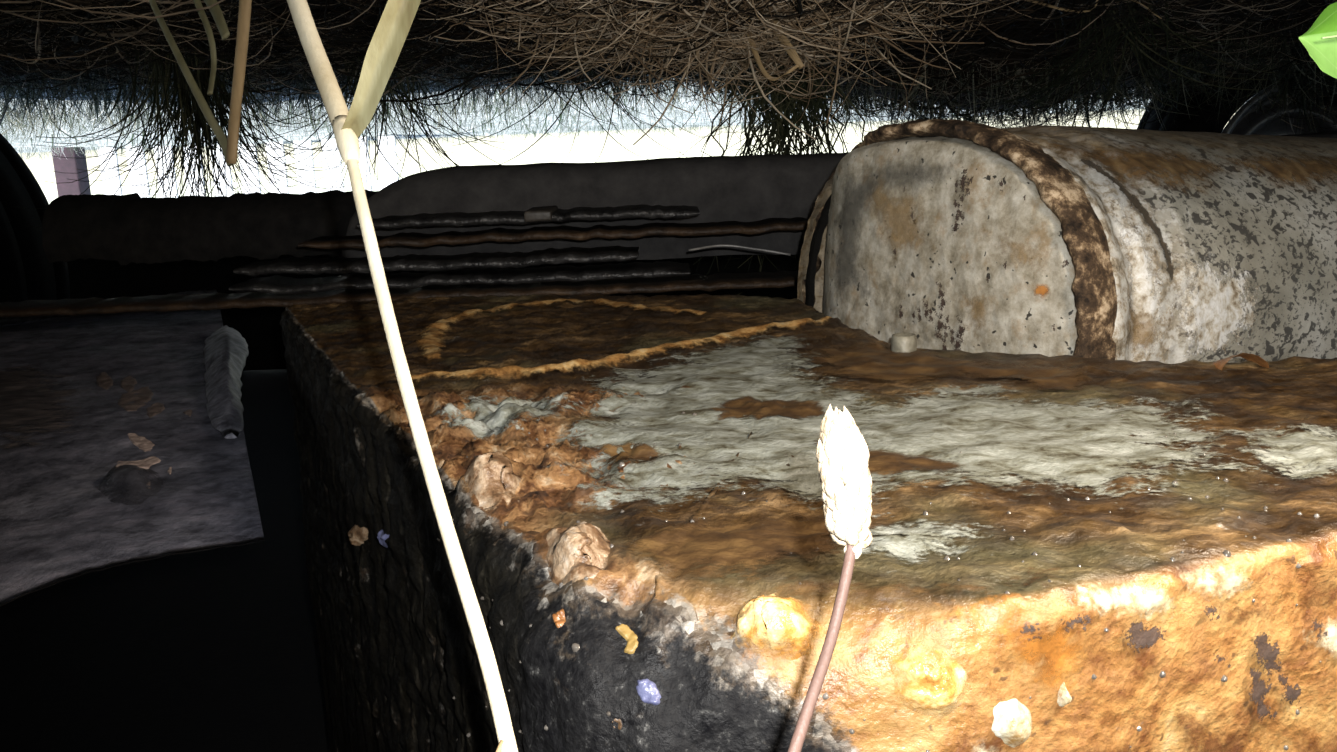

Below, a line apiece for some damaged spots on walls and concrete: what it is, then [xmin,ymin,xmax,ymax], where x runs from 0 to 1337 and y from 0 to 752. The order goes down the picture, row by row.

corrosion [626,512,984,602]
corrosion [552,609,566,628]
corrosion [1003,626,1078,686]
spalling [1120,622,1167,653]
spalling [1249,632,1301,722]
corrosion [1178,714,1243,752]